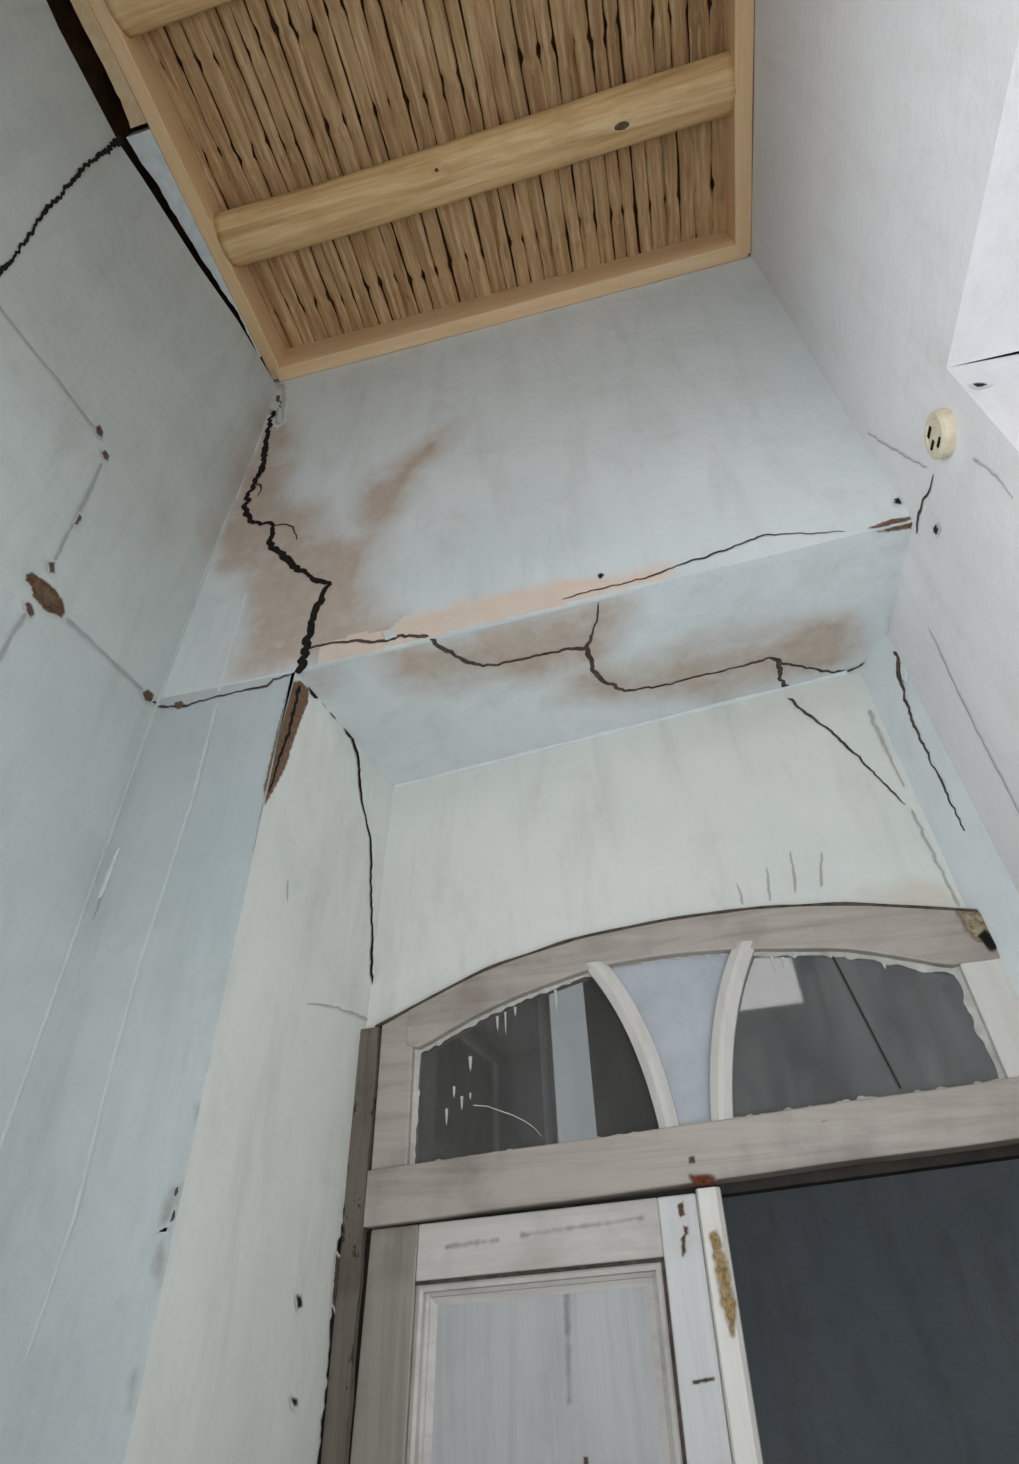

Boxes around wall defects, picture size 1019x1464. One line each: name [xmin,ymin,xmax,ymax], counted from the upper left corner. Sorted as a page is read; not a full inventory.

crack [0,135,124,428]
crack [0,612,28,665]
water stain [184,380,889,721]
crack [928,628,1019,814]
crack [973,457,1013,500]
crack [23,388,965,1364]